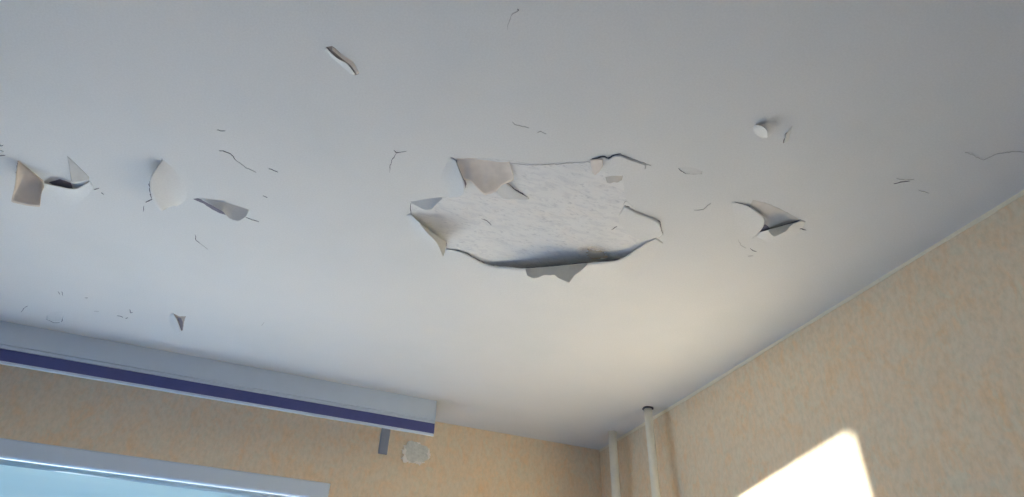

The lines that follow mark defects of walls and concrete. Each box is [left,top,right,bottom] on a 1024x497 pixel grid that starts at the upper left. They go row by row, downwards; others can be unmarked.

peeling [325,46,359,75]
peeling [11,156,94,207]
peeling [143,159,259,222]
peeling [407,154,663,310]
peeling [731,200,805,244]
peeling [169,313,186,334]